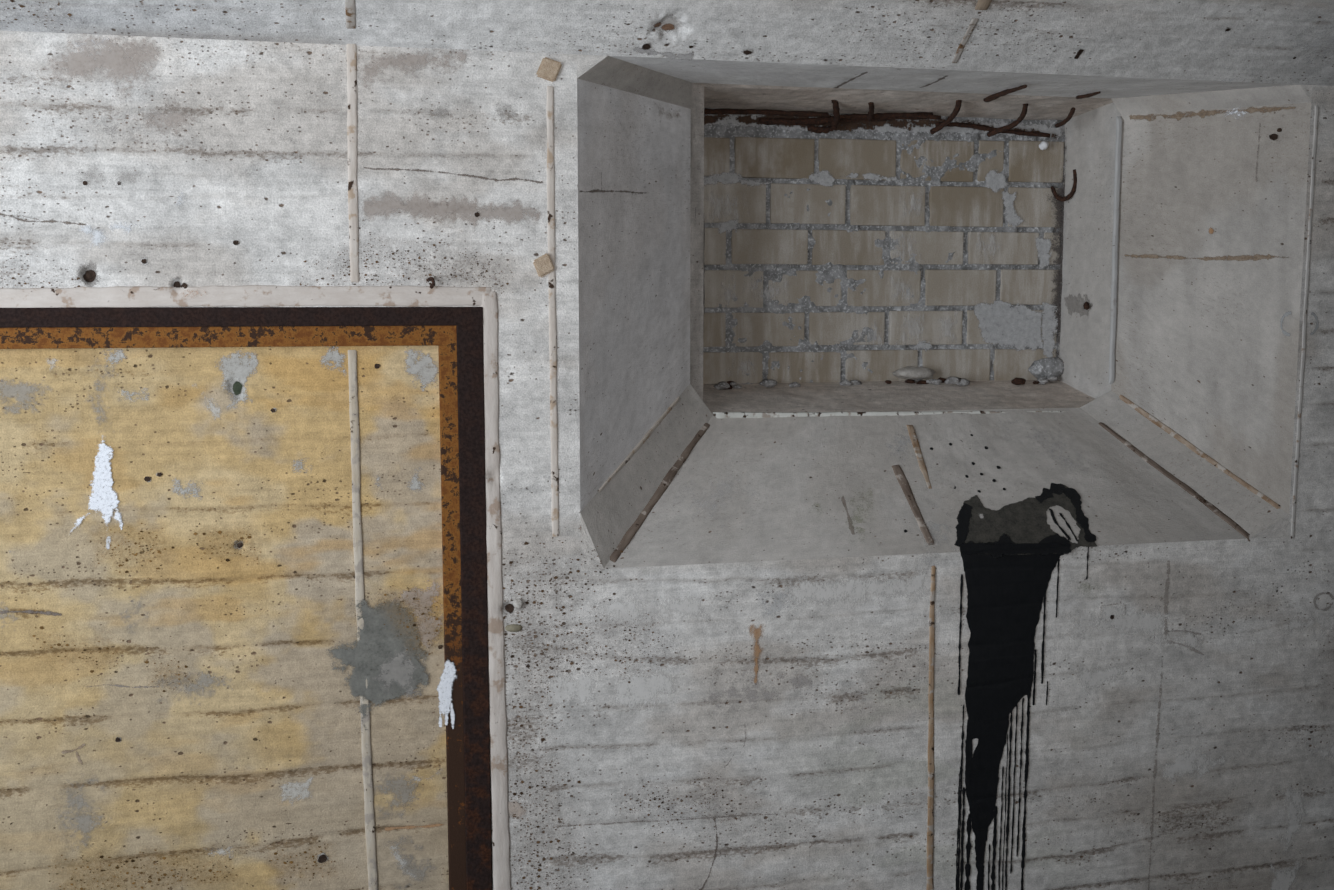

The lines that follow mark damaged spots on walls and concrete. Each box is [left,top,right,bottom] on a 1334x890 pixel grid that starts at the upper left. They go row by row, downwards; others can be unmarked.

crack [365,167,543,184]
rust [750,626,762,683]